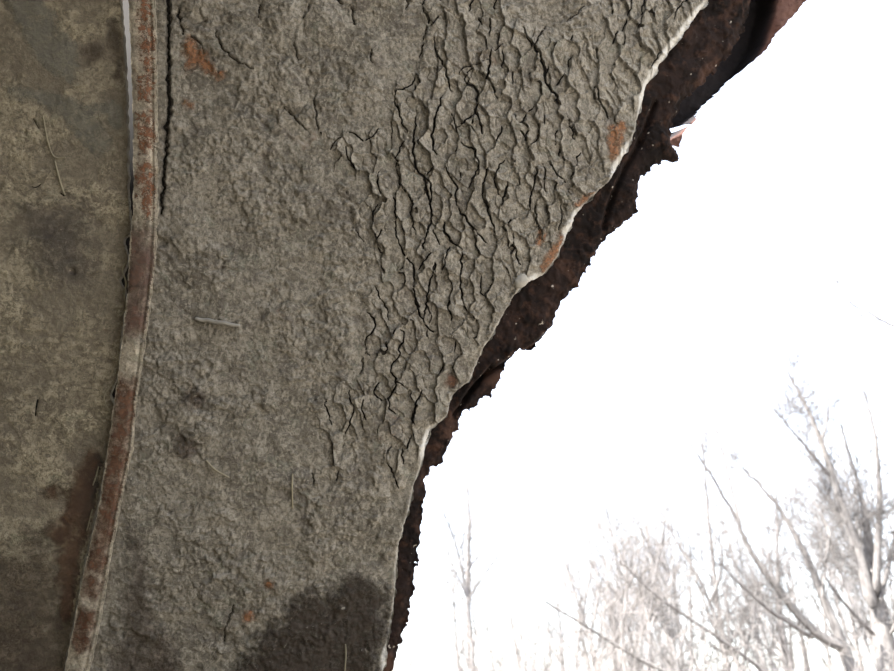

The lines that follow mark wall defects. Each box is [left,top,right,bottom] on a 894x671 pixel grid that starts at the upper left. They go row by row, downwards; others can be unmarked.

rust [134,0,158,222]
crack [160,0,254,214]
crack [284,96,379,169]
crack [346,0,584,375]
peeling [311,0,707,494]
crack [612,0,645,44]
crack [324,286,429,488]
rust [45,376,138,655]
leakage [235,573,390,671]